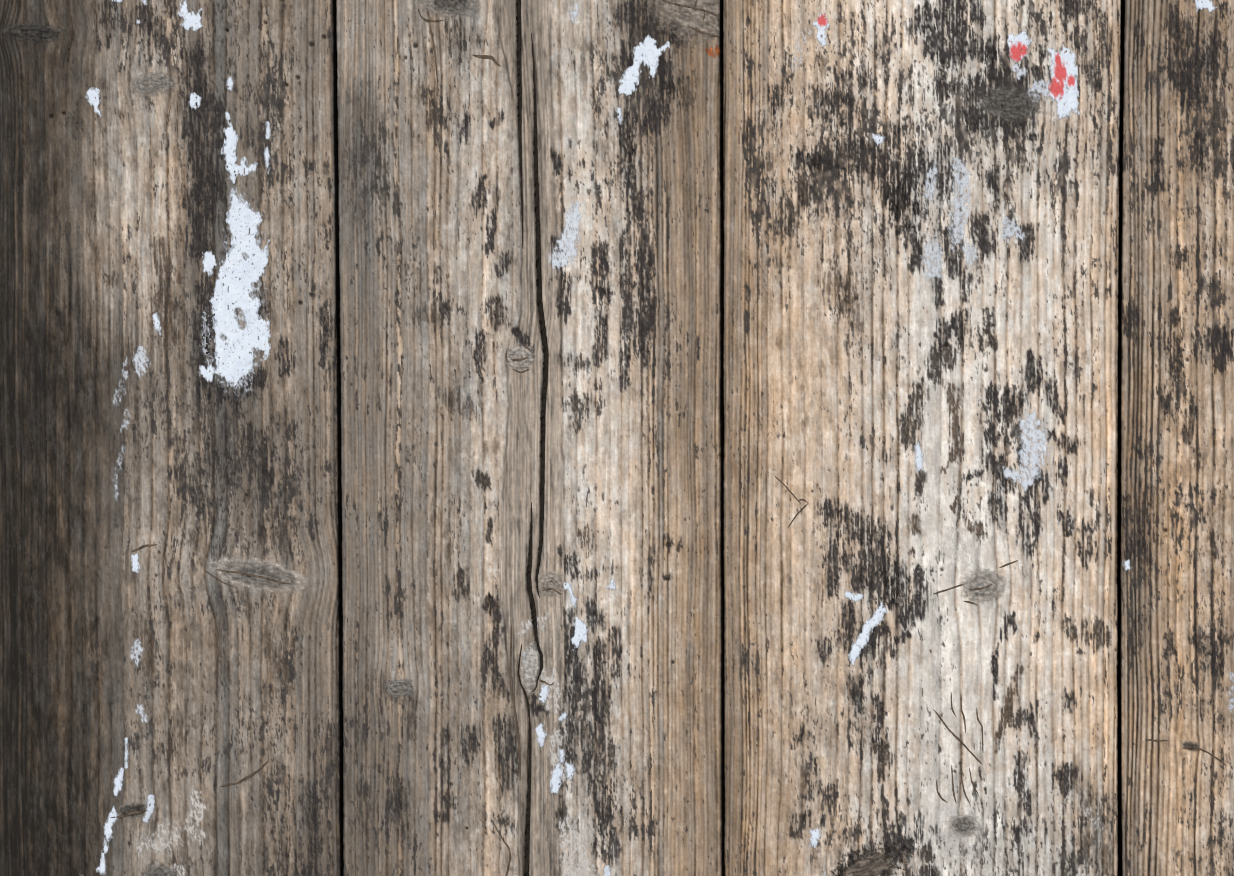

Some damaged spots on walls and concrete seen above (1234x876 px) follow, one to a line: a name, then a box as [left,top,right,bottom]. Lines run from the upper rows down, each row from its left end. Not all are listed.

peeling [1012,64,1050,102]
peeling [202,224,261,300]
peeling [199,312,259,391]
crack [473,0,561,876]